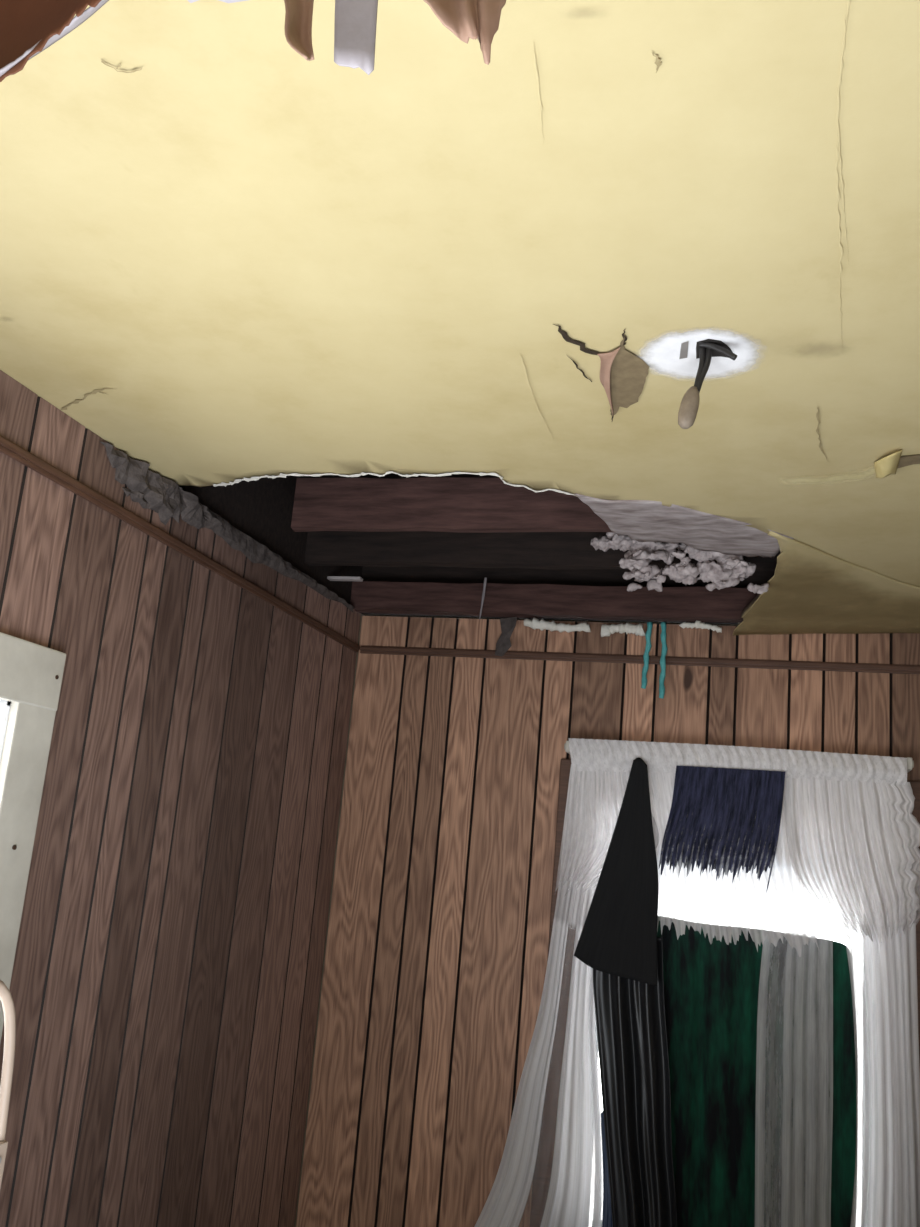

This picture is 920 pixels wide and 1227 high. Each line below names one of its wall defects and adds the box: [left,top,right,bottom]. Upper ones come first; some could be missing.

peeling [0,0,109,82]
peeling [284,0,314,61]
peeling [334,0,378,75]
peeling [423,0,506,65]
spalling [99,441,355,612]